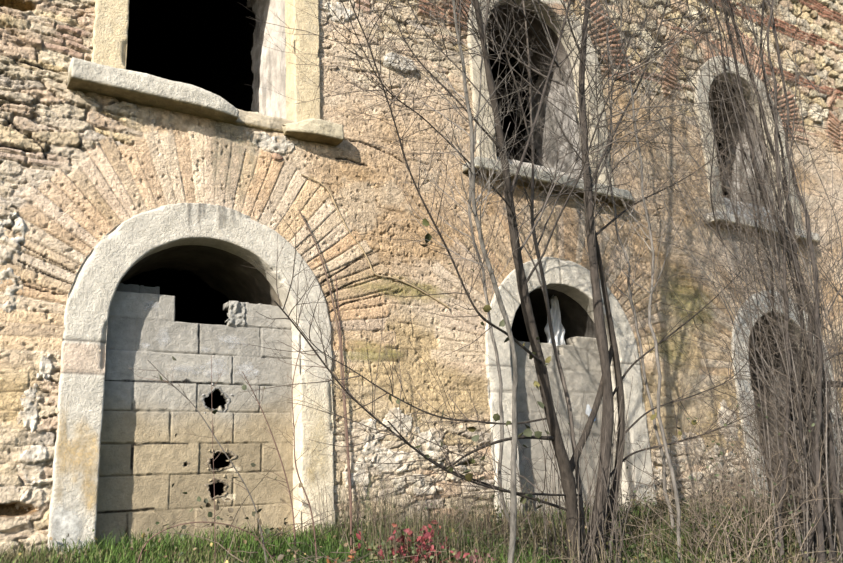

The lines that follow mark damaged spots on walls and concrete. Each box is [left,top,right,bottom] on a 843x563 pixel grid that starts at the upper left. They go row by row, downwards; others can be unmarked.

spalling [0,0,33,12]
spalling [201,383,231,414]
spalling [204,449,241,503]
spalling [0,504,39,517]